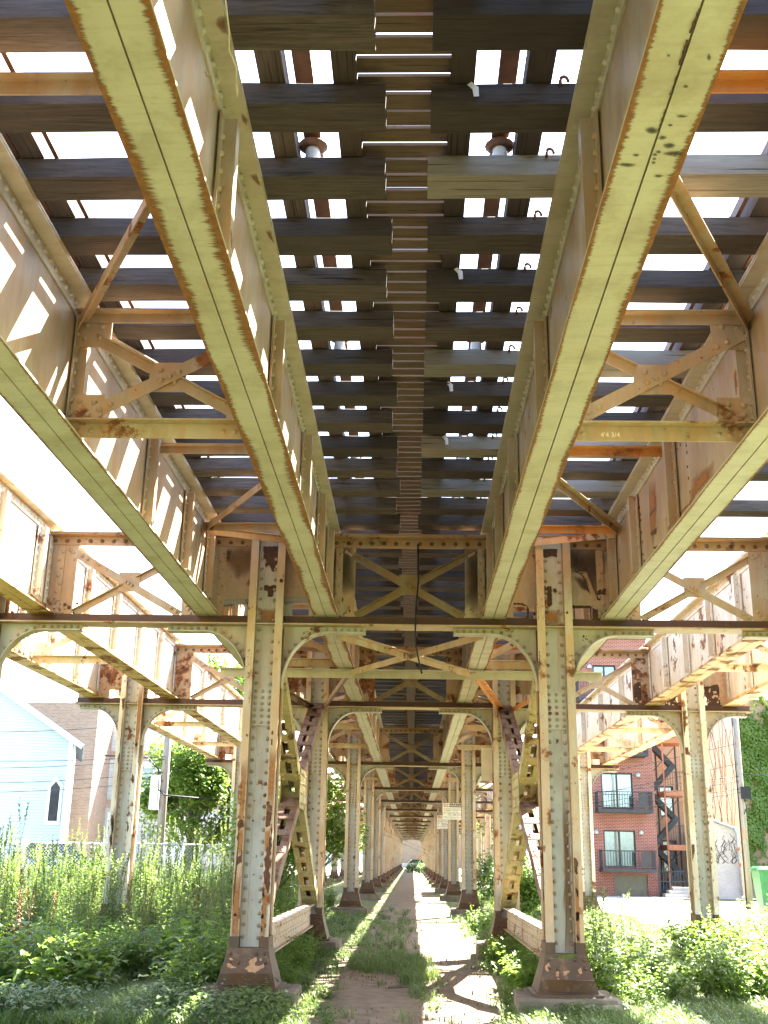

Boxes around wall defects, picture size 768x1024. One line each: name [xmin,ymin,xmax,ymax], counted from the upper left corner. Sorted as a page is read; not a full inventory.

corrosion [64,0,338,615]
corrosion [482,0,768,618]
corrosion [0,338,219,614]
peeling [263,546,284,597]
peeling [543,549,557,558]
peeling [544,586,557,607]
corrosion [258,754,275,800]
corrosion [238,770,255,852]
peeling [232,816,244,916]
corrosion [232,881,240,936]
peeling [227,947,264,973]